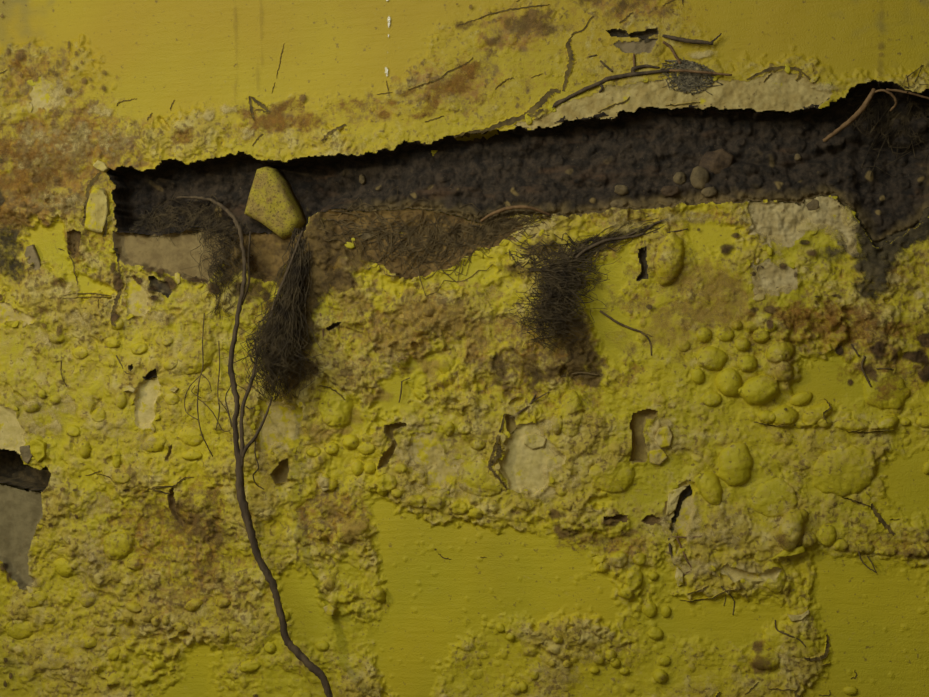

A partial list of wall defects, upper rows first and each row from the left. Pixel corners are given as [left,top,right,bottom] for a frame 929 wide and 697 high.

rust [505,10,553,35]
spalling [45,50,929,330]
spalling [495,406,577,500]
spalling [0,484,43,594]